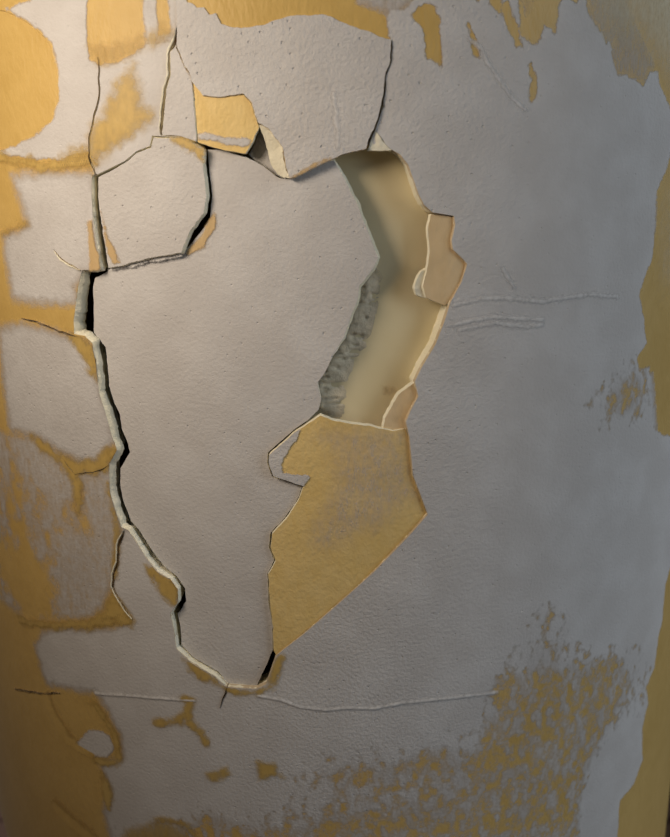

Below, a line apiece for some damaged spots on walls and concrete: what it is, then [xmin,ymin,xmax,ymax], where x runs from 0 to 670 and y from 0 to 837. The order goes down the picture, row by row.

crack [88,57,100,175]
crack [159,27,177,135]
crack [367,42,392,146]
crack [54,251,80,270]
spalling [74,47,465,688]
crack [110,531,133,619]